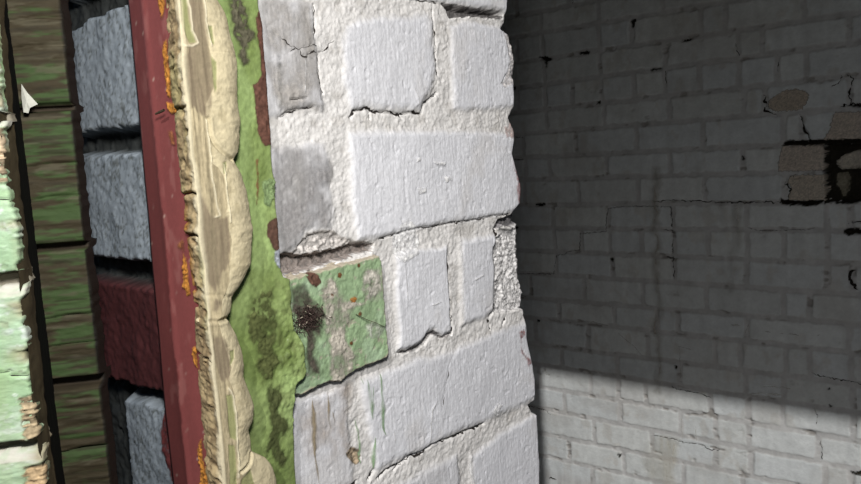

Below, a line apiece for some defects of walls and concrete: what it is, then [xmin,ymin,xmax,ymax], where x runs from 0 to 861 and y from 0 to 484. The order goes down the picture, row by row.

peeling [21,84,37,113]
peeling [0,128,8,182]
spalling [778,111,861,206]
peeling [19,396,43,439]
peeling [22,461,50,484]